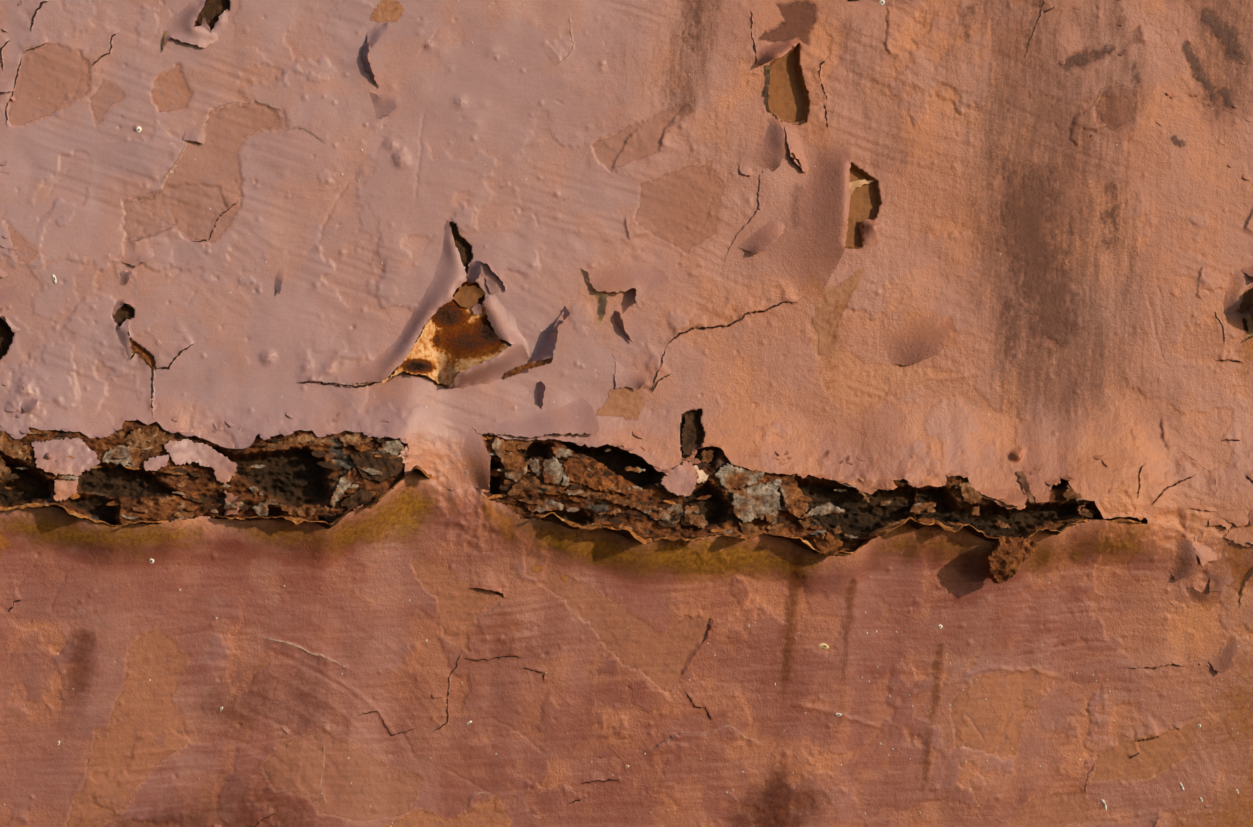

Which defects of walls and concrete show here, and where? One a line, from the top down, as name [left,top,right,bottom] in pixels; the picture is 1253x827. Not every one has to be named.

peeling [160,0,230,51]
damp [1061,44,1115,71]
damp [1183,41,1234,115]
damp [1202,7,1245,62]
peeling [722,2,955,366]
crack [127,331,193,419]
spalling [0,218,1148,584]
crack [651,297,803,392]
damp [992,155,1099,362]
peeling [1219,264,1253,338]
rust [529,525,819,672]
peeling [1168,536,1253,611]